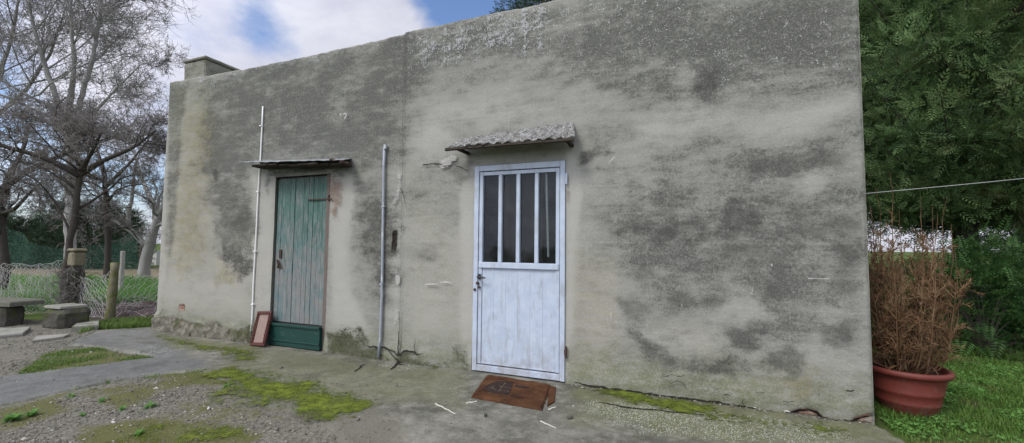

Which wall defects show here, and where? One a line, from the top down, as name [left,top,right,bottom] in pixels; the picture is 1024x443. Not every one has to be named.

leakage [419,7,549,69]
peeling [440,155,457,168]
leakage [327,327,383,360]
crack [575,382,872,422]